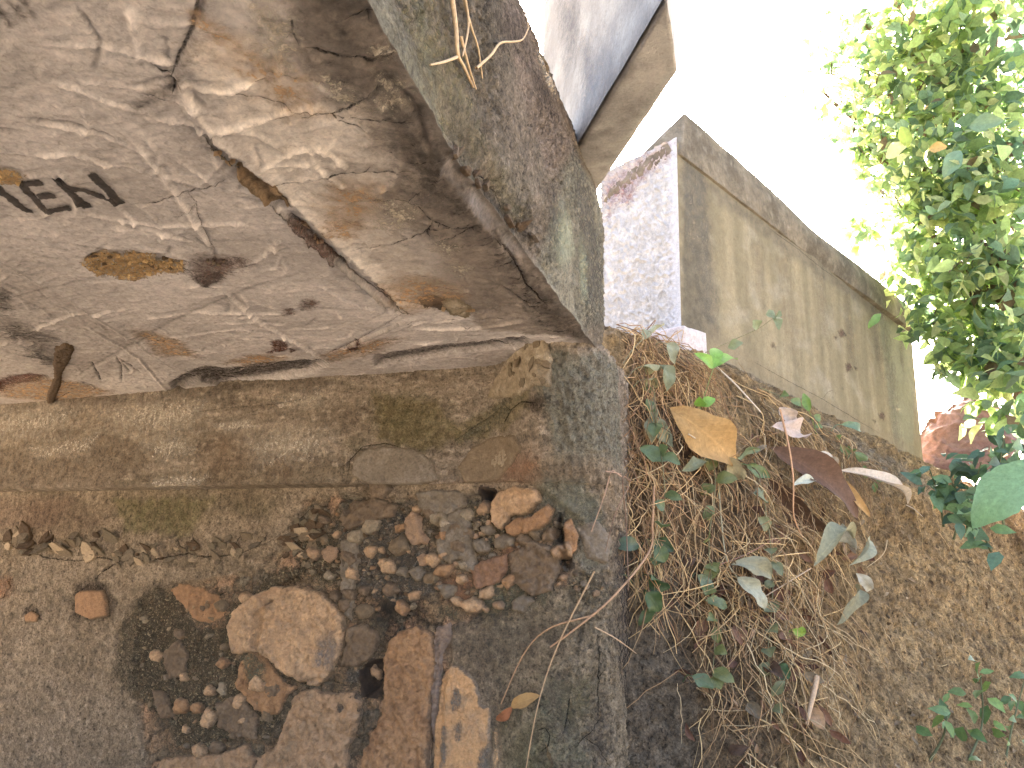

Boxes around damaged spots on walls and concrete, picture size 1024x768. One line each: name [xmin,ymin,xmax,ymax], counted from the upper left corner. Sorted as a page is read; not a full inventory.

crack [159,0,199,92]
crack [287,20,393,61]
crack [149,138,239,245]
crack [273,182,542,355]